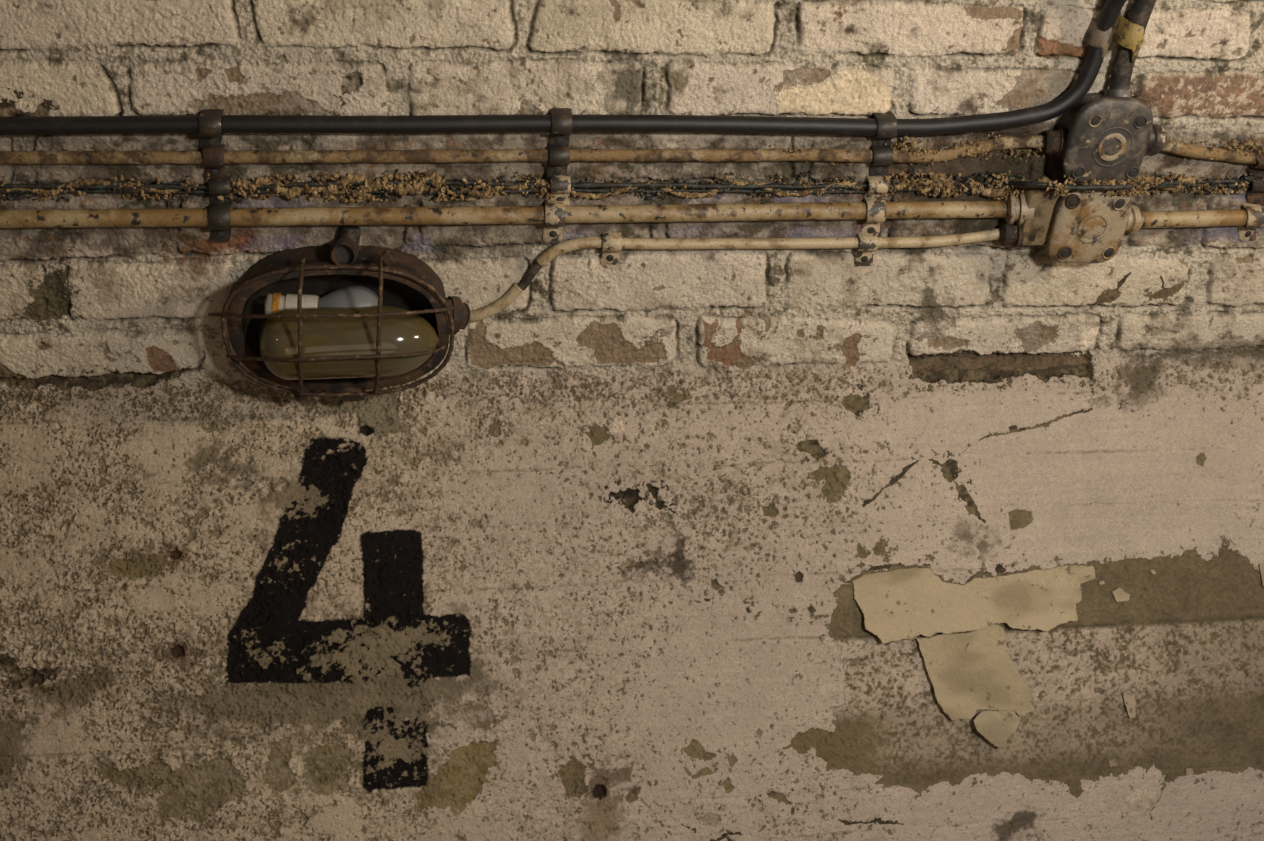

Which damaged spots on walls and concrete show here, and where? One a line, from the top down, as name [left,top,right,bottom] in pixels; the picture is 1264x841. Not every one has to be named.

peeling [466,314,674,375]
peeling [697,307,880,418]
spalling [905,315,1122,409]
spalling [603,480,677,515]
crack [862,408,1093,523]
peeling [694,579,726,611]
peeling [778,530,1264,810]